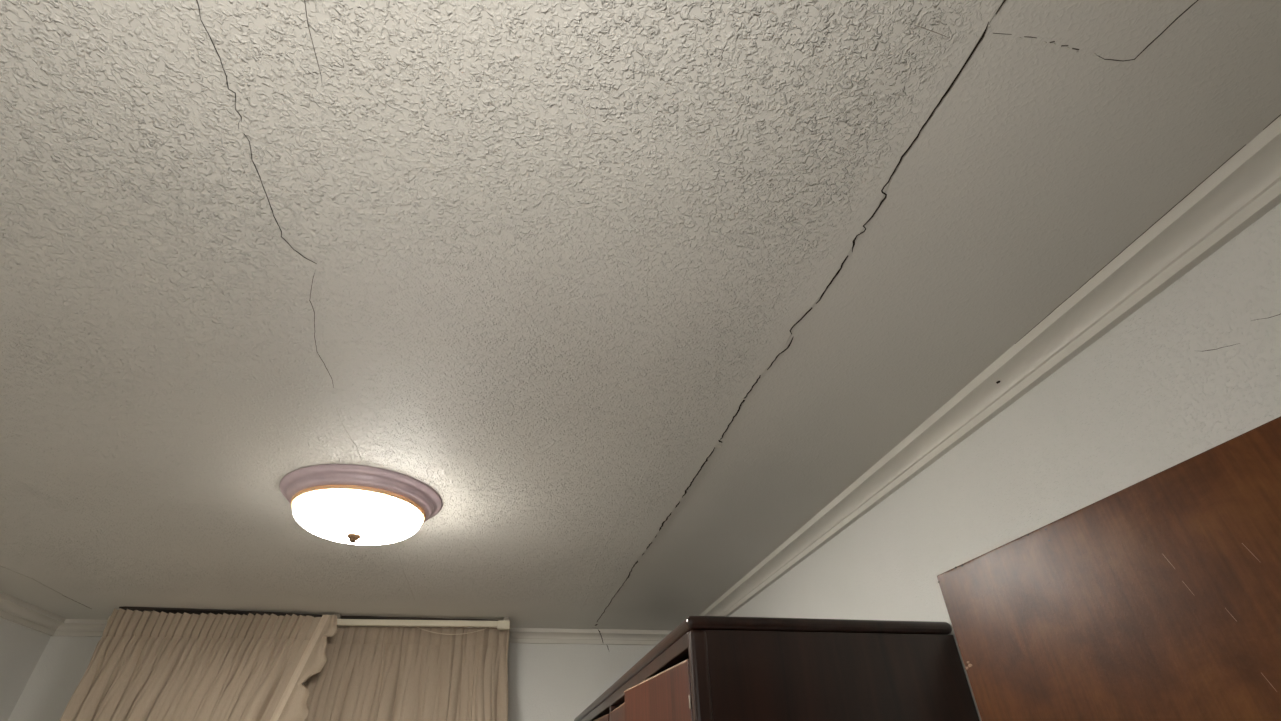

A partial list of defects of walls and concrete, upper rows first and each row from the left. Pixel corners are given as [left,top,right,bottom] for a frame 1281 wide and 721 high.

crack [196,0,361,459]
crack [595,0,1198,650]